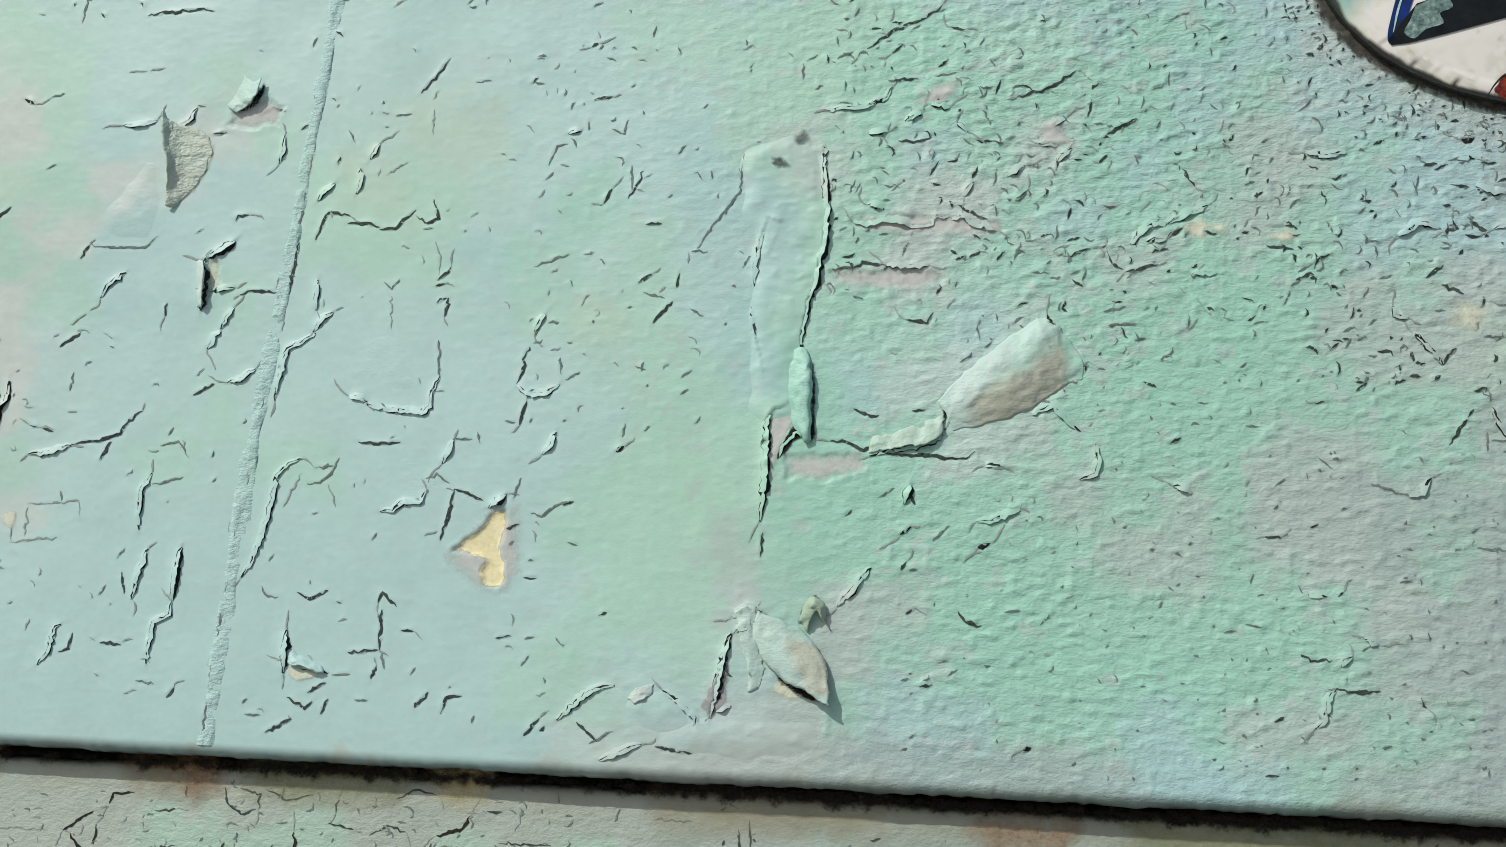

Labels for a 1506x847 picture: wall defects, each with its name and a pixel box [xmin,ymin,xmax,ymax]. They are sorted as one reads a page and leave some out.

peeling [228,76,278,125]
peeling [161,108,213,208]
crack [714,0,1506,780]
peeling [454,511,517,587]
crack [496,601,769,761]
peeling [733,595,831,707]
crack [614,803,756,847]